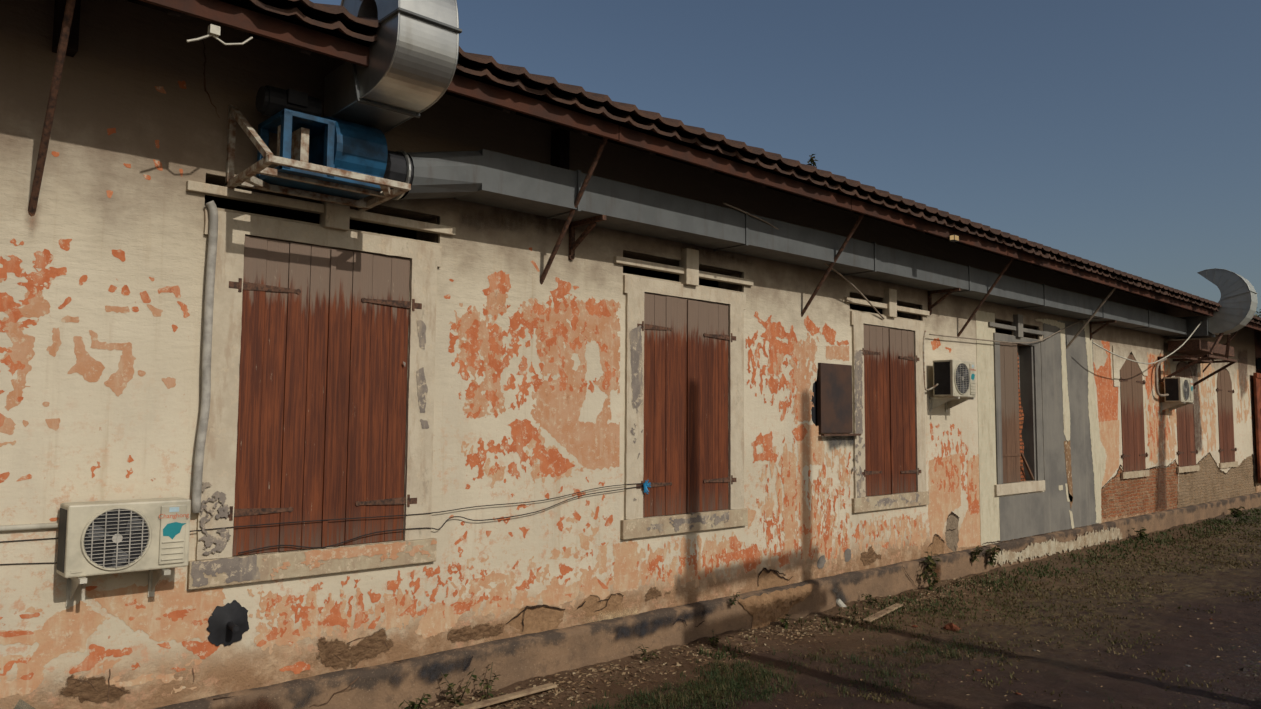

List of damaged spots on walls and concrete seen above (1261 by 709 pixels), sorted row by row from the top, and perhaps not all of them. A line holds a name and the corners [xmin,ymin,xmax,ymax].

peeling [0,238,146,447]
peeling [0,270,981,703]
flaking render [1093,340,1256,519]